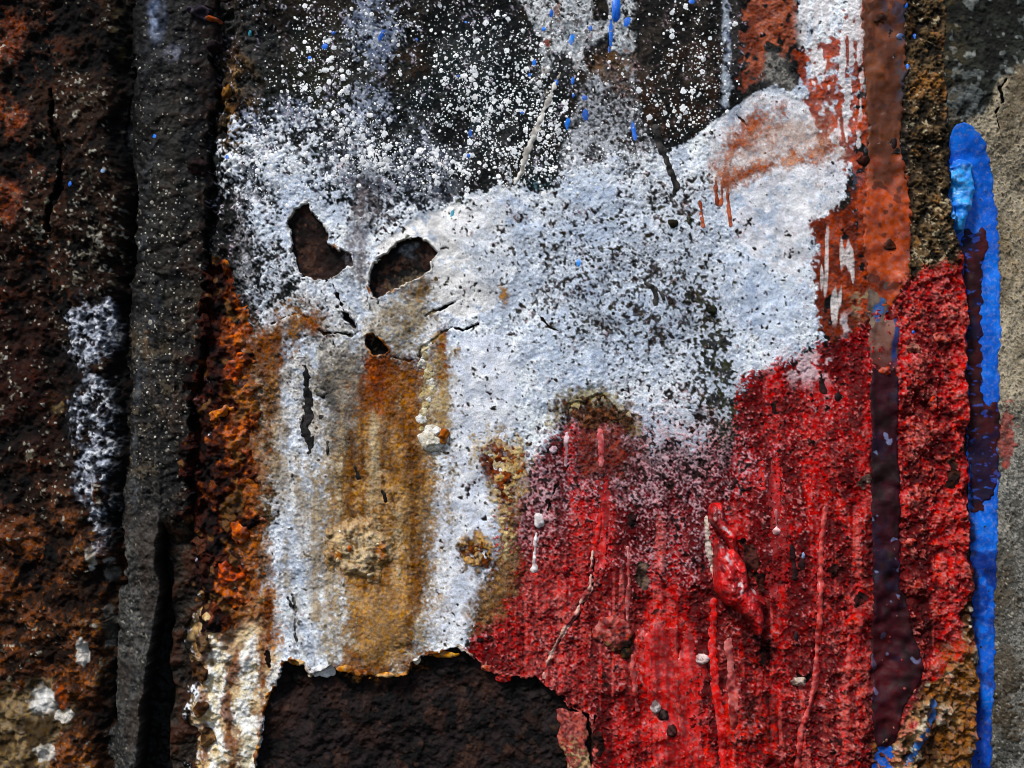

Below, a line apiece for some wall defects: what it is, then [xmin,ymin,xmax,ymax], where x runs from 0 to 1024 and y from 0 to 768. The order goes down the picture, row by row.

crack [45,89,66,232]
rust [221,84,241,115]
peeling [286,198,354,284]
peeling [366,237,440,299]
rust [174,257,462,748]
peeling [253,644,605,768]